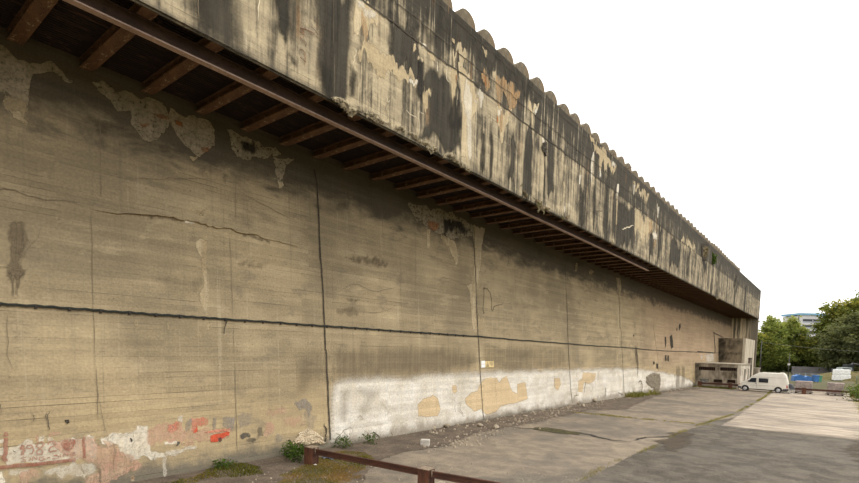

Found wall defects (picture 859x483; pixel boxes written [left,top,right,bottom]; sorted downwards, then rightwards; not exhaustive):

leakage [276,0,289,42]
flaking render [0,44,73,124]
flaking render [92,80,215,162]
flaking render [227,129,295,188]
leakage [316,0,565,201]
leakage [564,135,695,277]
leakage [8,222,27,294]